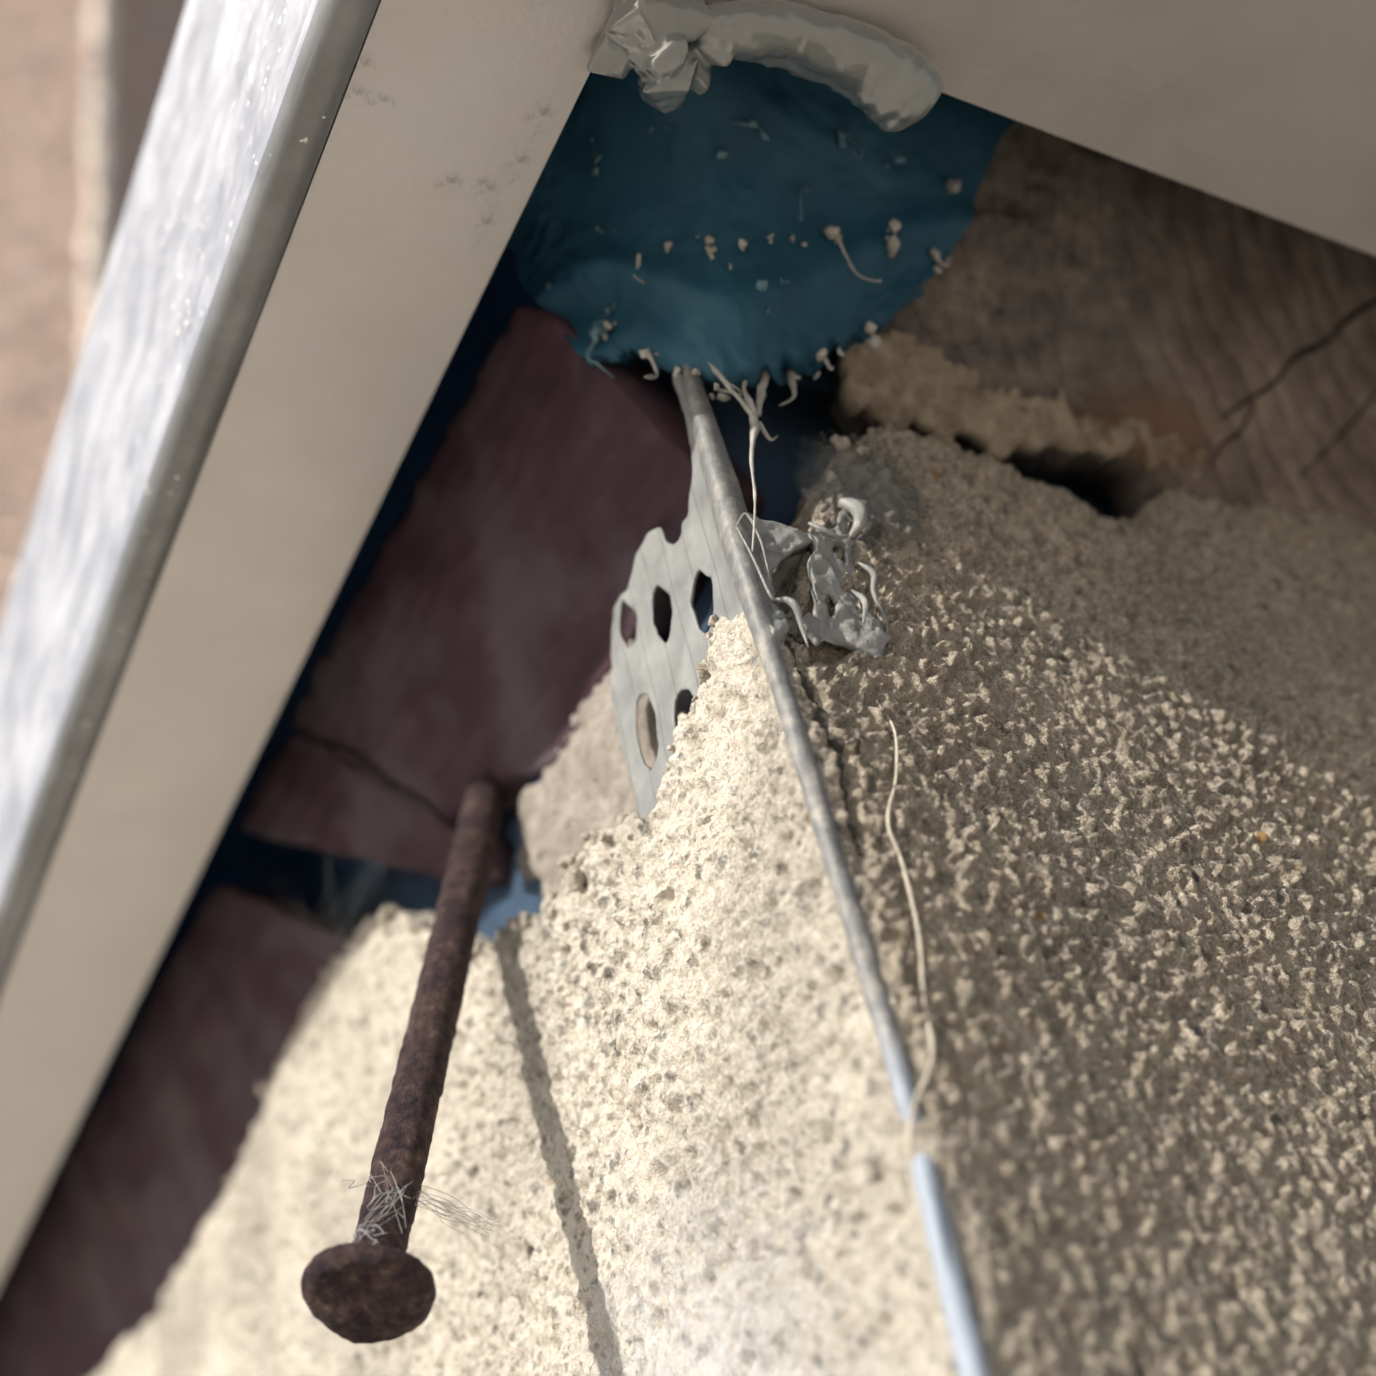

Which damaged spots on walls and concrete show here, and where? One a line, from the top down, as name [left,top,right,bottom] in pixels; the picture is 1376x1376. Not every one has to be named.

crack [1210,299,1376,463]
spalling [830,427,891,456]
spalling [705,614,719,639]
spalling [690,656,711,716]
crack [291,724,449,825]
spalling [470,795,657,968]